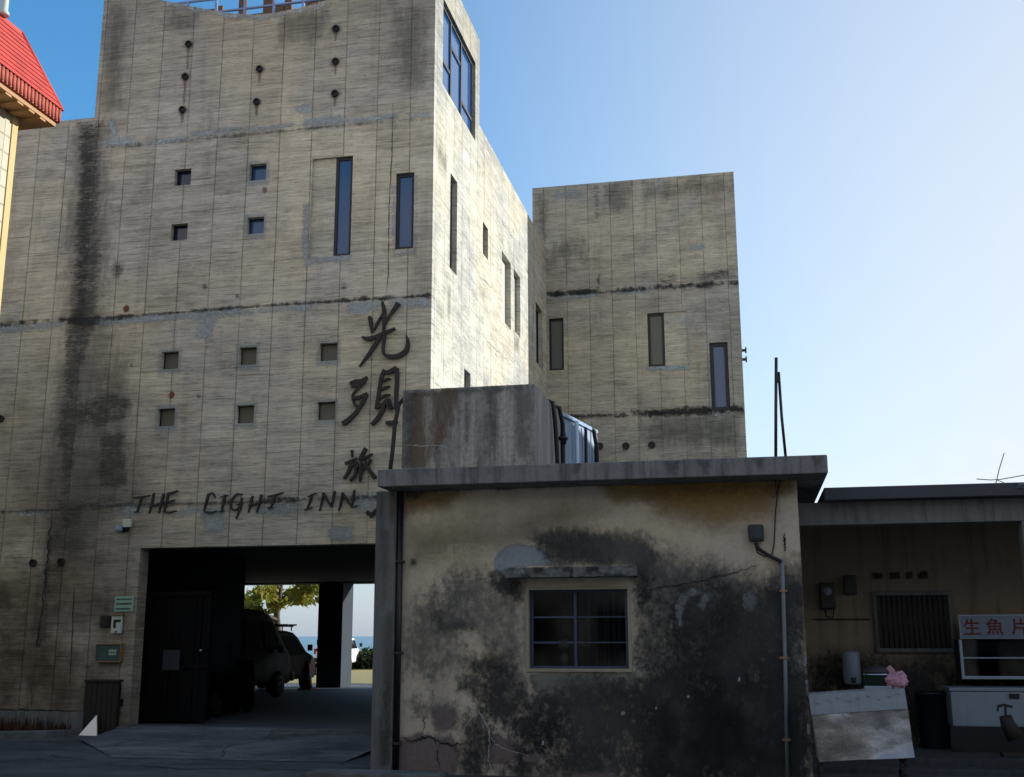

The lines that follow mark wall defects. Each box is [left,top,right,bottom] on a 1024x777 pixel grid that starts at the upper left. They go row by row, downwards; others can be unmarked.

water stain [0,123,311,527]
water stain [347,298,428,314]
crack [261,496,304,504]
crack [2,510,52,647]
spalling [493,544,566,576]
crack [639,566,755,592]
water stain [407,530,1024,777]
crack [406,707,523,770]